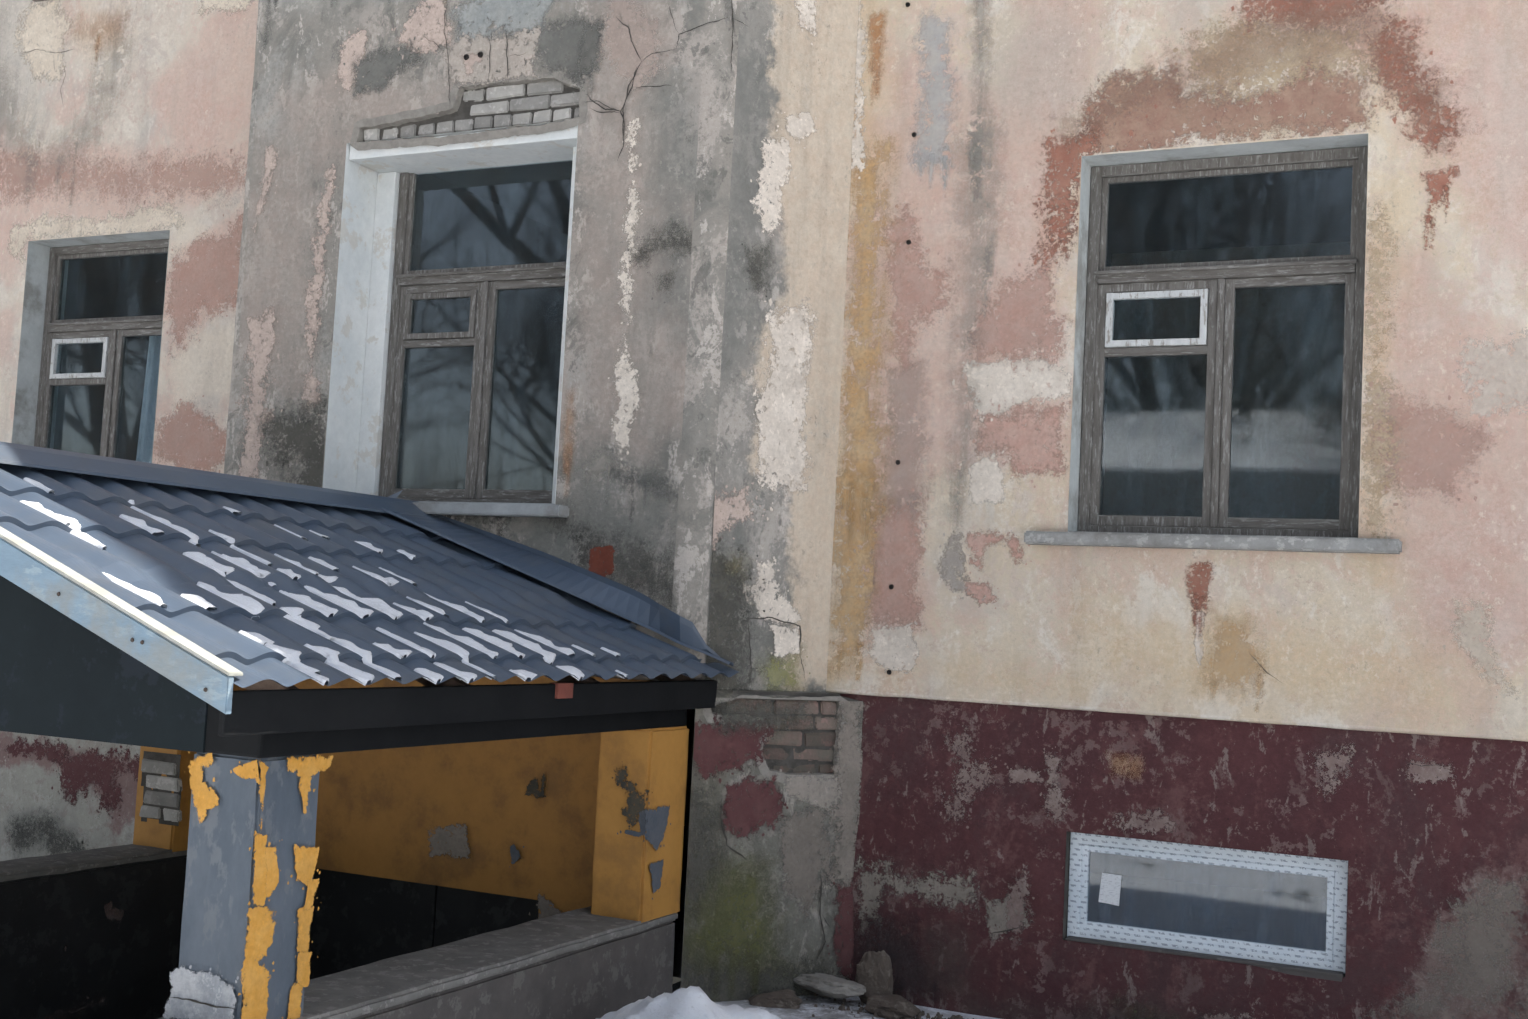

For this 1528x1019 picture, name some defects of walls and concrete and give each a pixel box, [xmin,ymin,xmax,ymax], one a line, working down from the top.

flaking render [350,0,588,151]
crack [586,0,747,158]
peeling [2,137,283,479]
peeling [598,0,669,467]
peeling [749,111,817,237]
peeling [952,0,1464,539]
peeling [864,489,1032,683]
peeling [287,755,333,814]
peeling [693,690,850,846]
peeling [5,736,321,1019]
damp [681,959,841,1002]
damp [862,922,937,994]